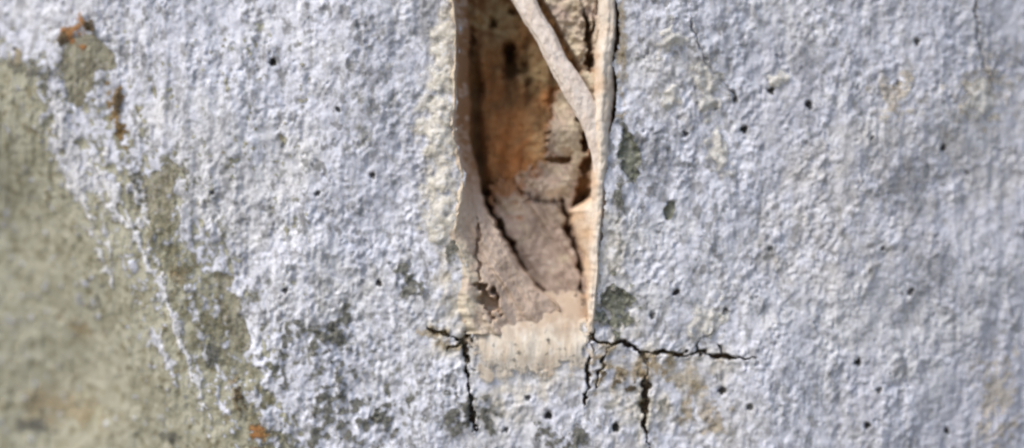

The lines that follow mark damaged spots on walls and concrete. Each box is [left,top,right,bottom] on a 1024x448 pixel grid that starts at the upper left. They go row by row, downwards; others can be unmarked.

leakage [56,31,67,46]
corrosion [58,13,86,50]
leakage [8,59,67,101]
leakage [112,88,123,116]
spalling [448,0,656,382]
crack [427,328,479,432]
crack [583,330,757,445]
leakage [17,397,59,436]